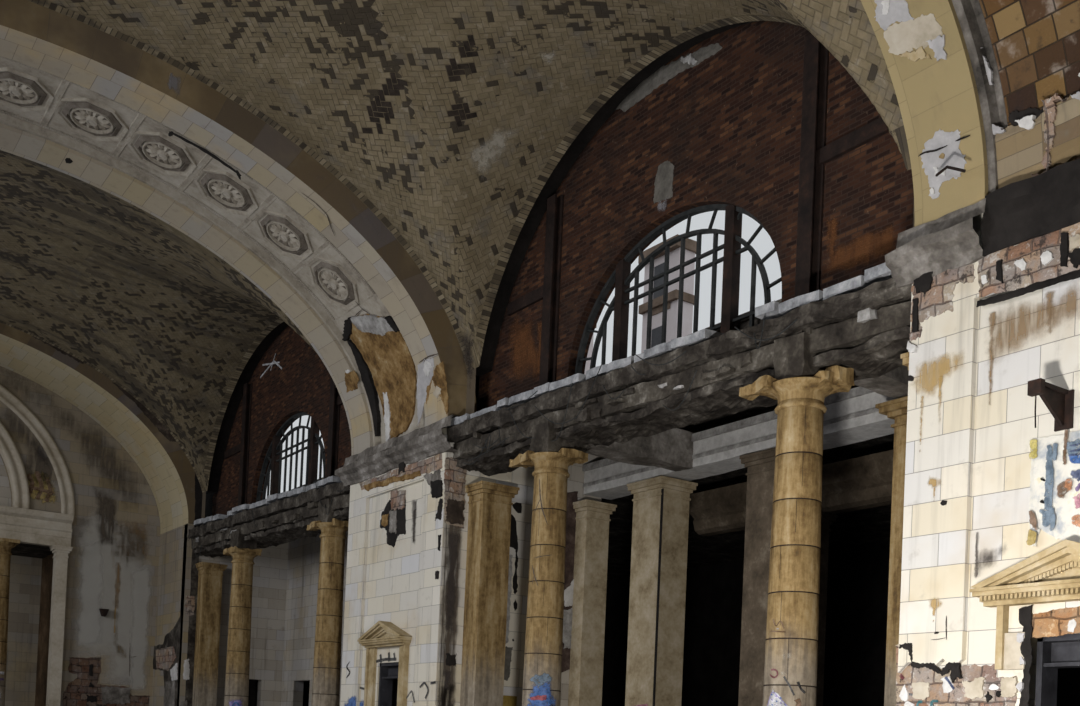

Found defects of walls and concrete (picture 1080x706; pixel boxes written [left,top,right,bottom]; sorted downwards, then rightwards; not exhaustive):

spalling [616,43,723,112]
peeling [874,0,947,62]
spalling [907,91,1080,353]
spalling [342,313,449,442]
spalling [63,657,150,706]
spalling [153,549,199,706]
spalling [896,605,1080,706]